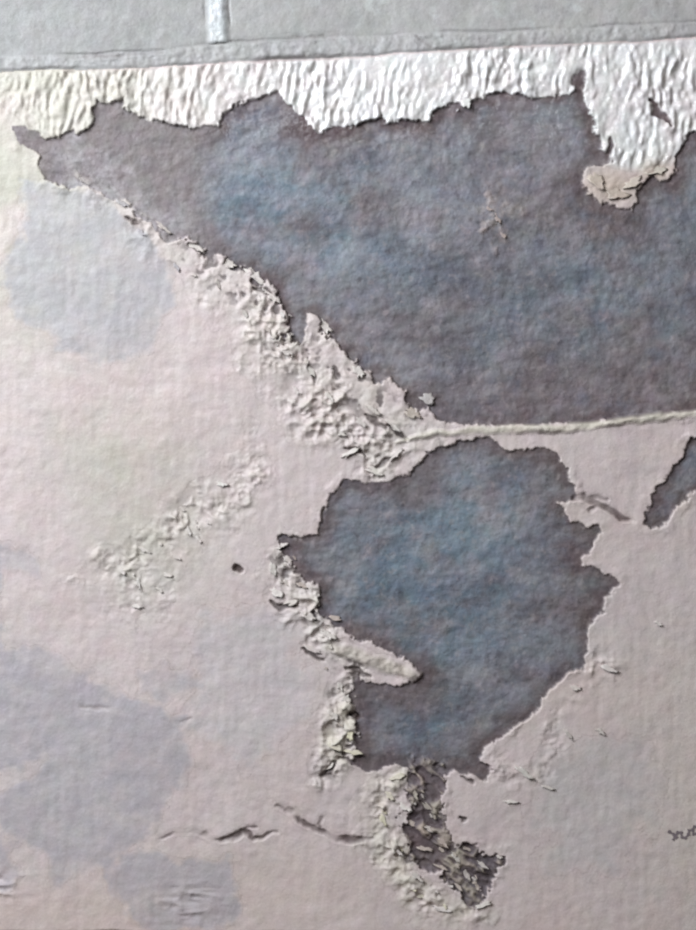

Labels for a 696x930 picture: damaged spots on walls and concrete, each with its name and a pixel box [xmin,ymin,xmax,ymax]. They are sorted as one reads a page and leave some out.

crack [157,801,376,846]
spalling [0,39,696,485]
spalling [255,437,620,930]
spalling [644,438,696,529]